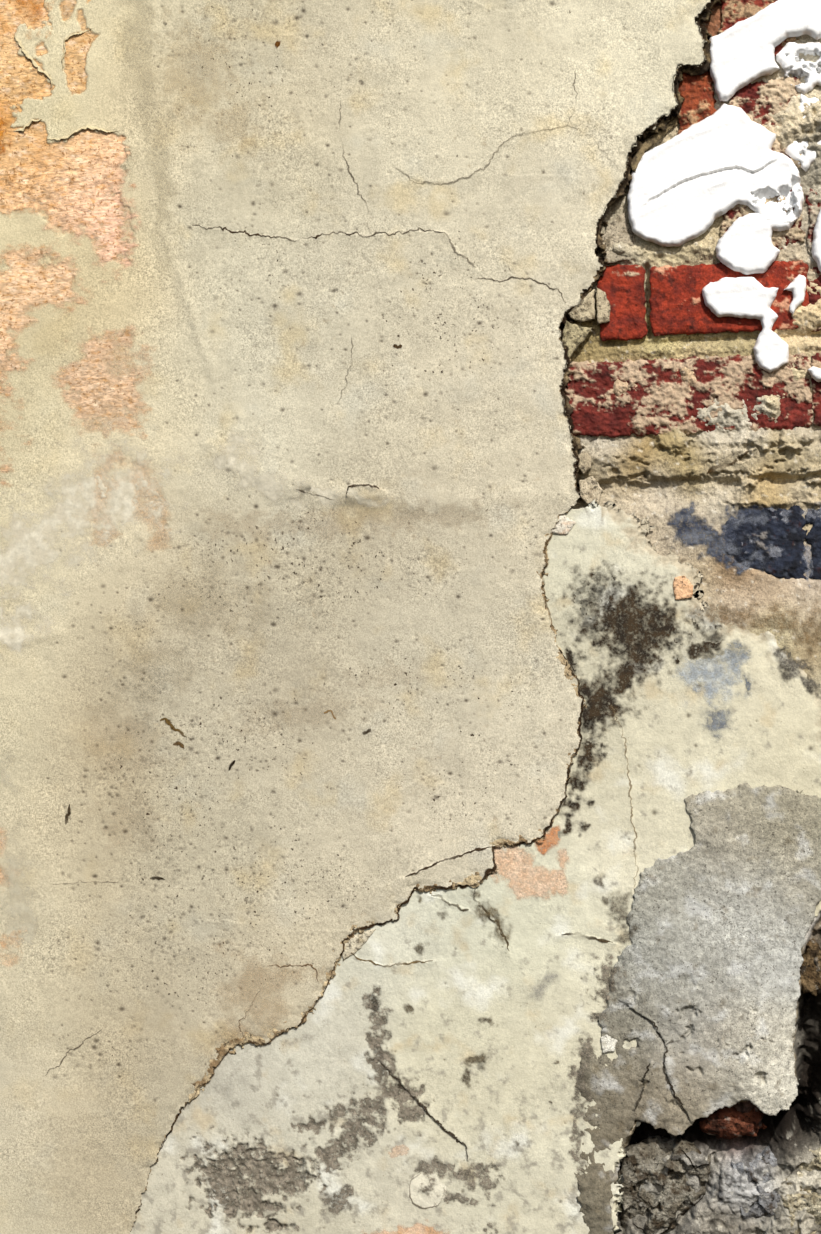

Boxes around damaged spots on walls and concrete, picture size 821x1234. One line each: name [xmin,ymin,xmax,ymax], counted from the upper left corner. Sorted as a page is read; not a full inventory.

flaking render [0,0,137,266]
crack [193,225,566,303]
flaking render [0,247,85,396]
flaking render [59,327,145,432]
flaking render [130,0,721,1233]
crack [351,952,433,967]
crack [405,846,509,951]
crack [562,933,613,943]
crack [381,1063,468,1160]